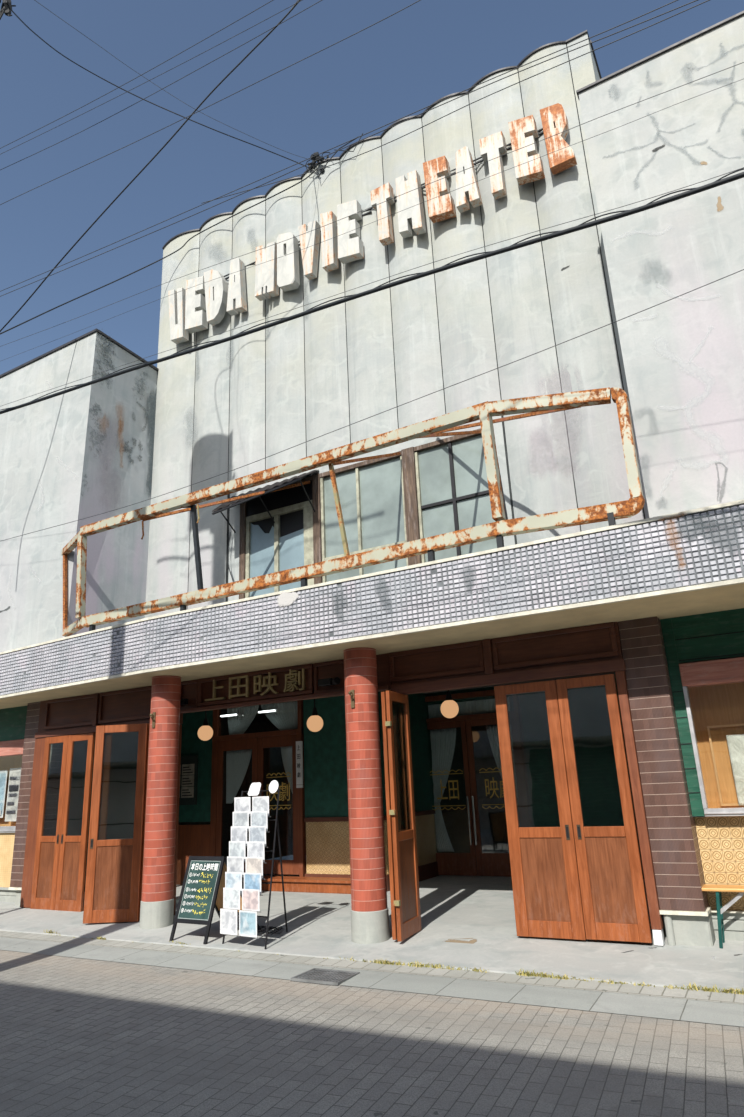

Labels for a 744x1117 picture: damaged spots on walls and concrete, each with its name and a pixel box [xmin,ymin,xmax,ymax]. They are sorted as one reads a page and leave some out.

leakage [141,379,157,495]